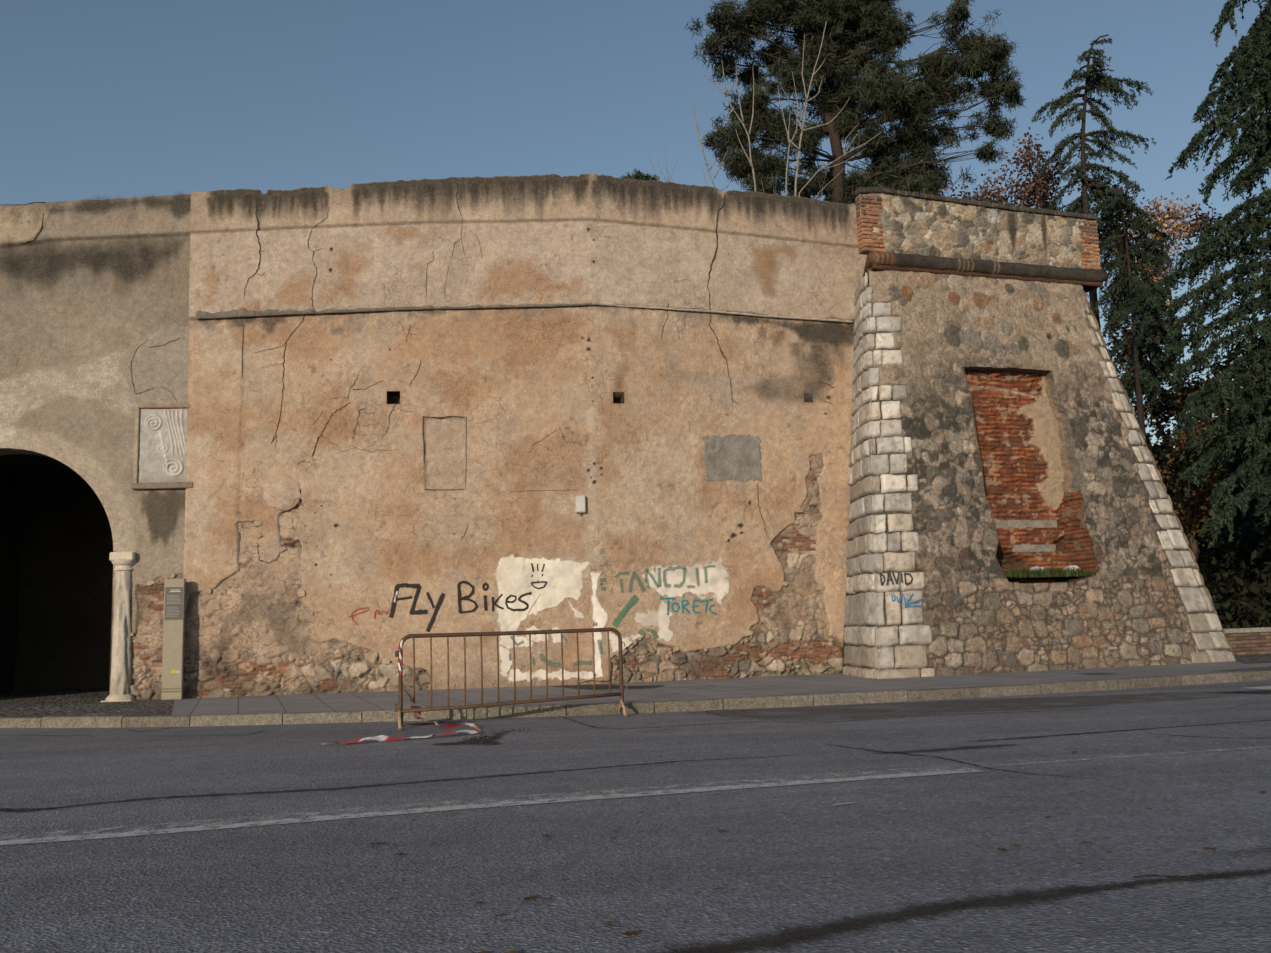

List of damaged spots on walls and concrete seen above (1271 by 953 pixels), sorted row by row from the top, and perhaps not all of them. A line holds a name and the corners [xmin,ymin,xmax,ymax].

leakage [355,174,847,222]
leakage [0,244,176,279]
crack [661,195,736,417]
crack [130,338,180,400]
crack [238,201,467,582]
leakage [143,489,184,542]
flaking render [183,500,430,698]
flaking render [567,454,843,683]
flaking render [129,571,183,700]
peeling [525,625,564,643]
peeling [499,646,593,683]